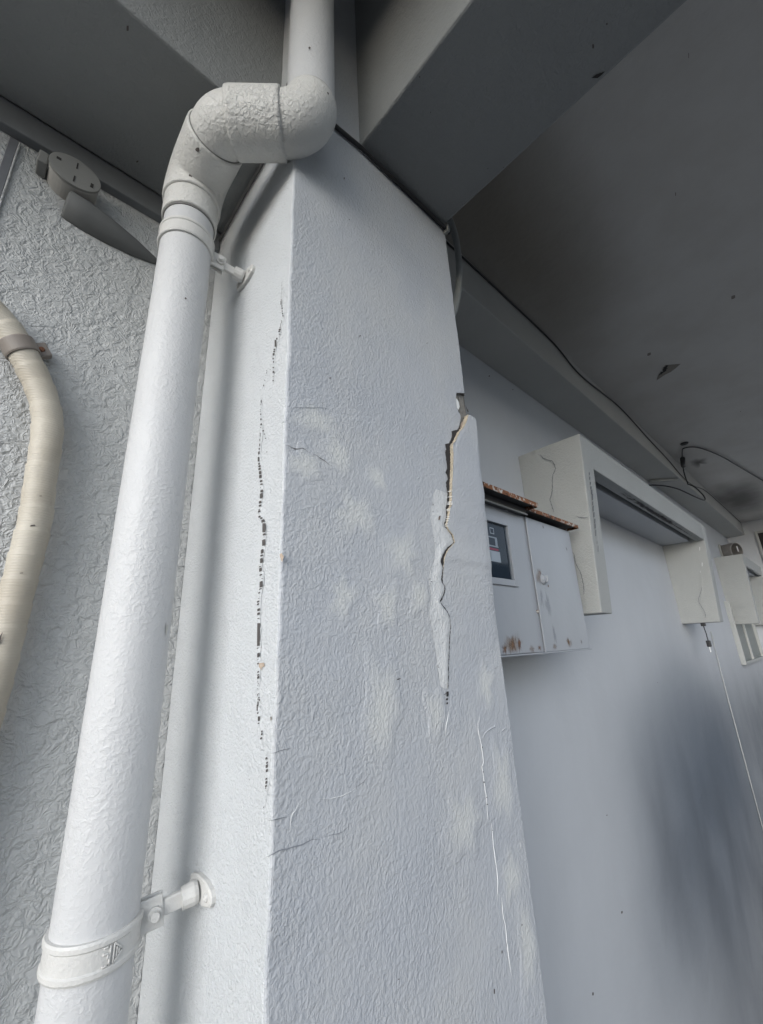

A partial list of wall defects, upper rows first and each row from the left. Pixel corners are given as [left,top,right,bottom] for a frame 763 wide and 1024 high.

crack [438,414,504,735]